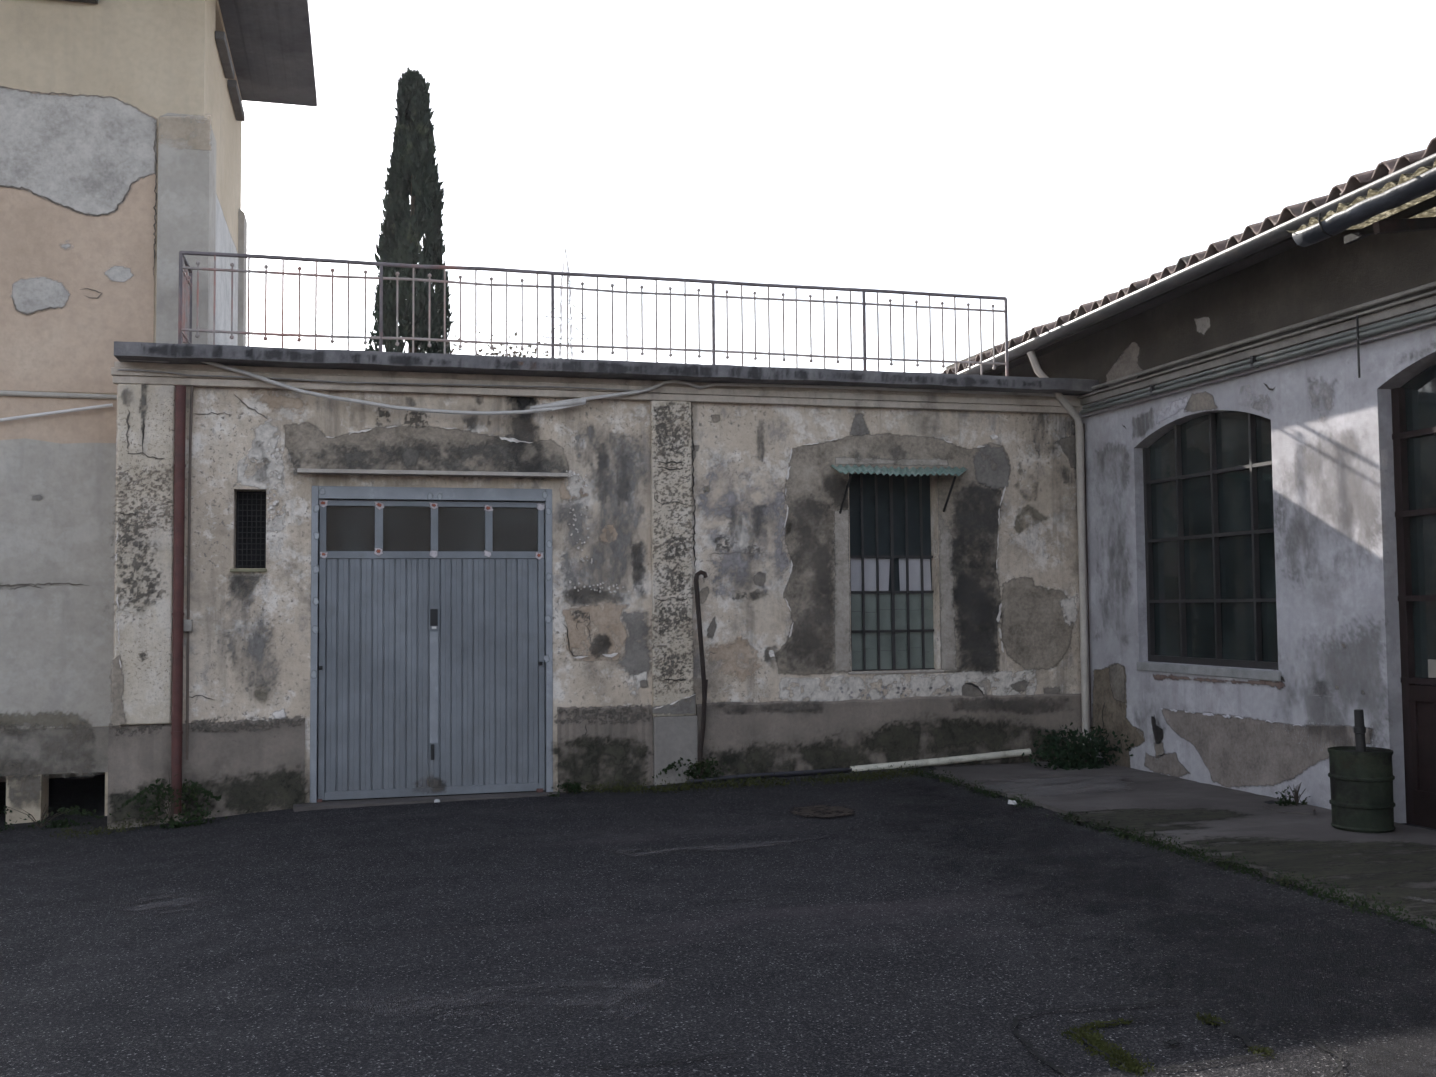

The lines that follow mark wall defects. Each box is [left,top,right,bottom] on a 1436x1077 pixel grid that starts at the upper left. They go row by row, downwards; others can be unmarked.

flaking render [555,402,1077,724]
damp [951,444,1047,675]
flaking render [1092,663,1373,788]